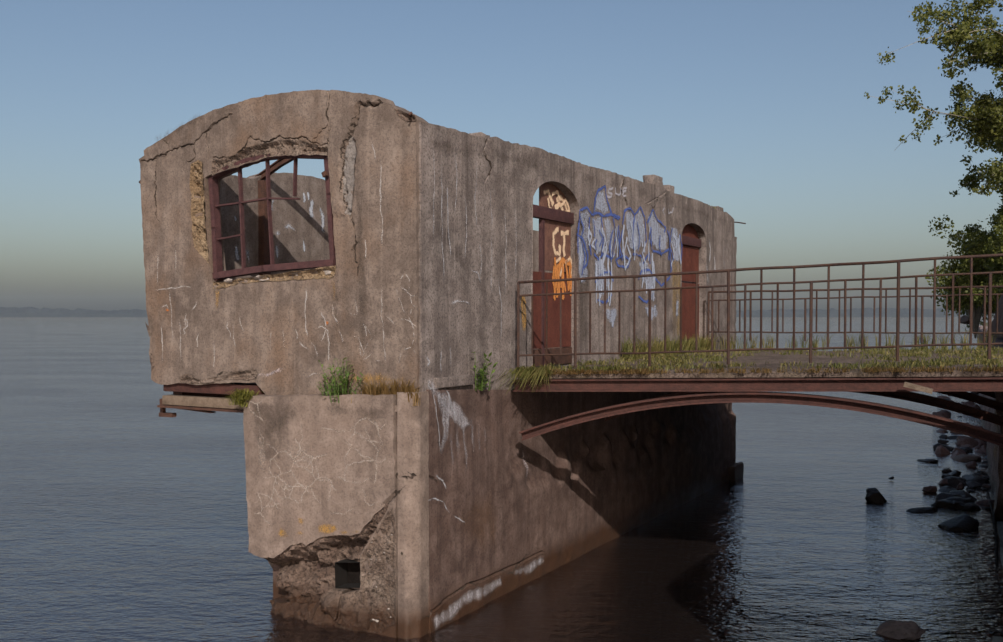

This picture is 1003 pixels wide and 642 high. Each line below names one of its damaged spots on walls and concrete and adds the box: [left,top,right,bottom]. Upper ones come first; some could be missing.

crack [144,114,232,221]
crack [234,95,383,275]
spalling [343,137,357,216]
crack [249,401,437,523]
spalling [264,502,396,642]